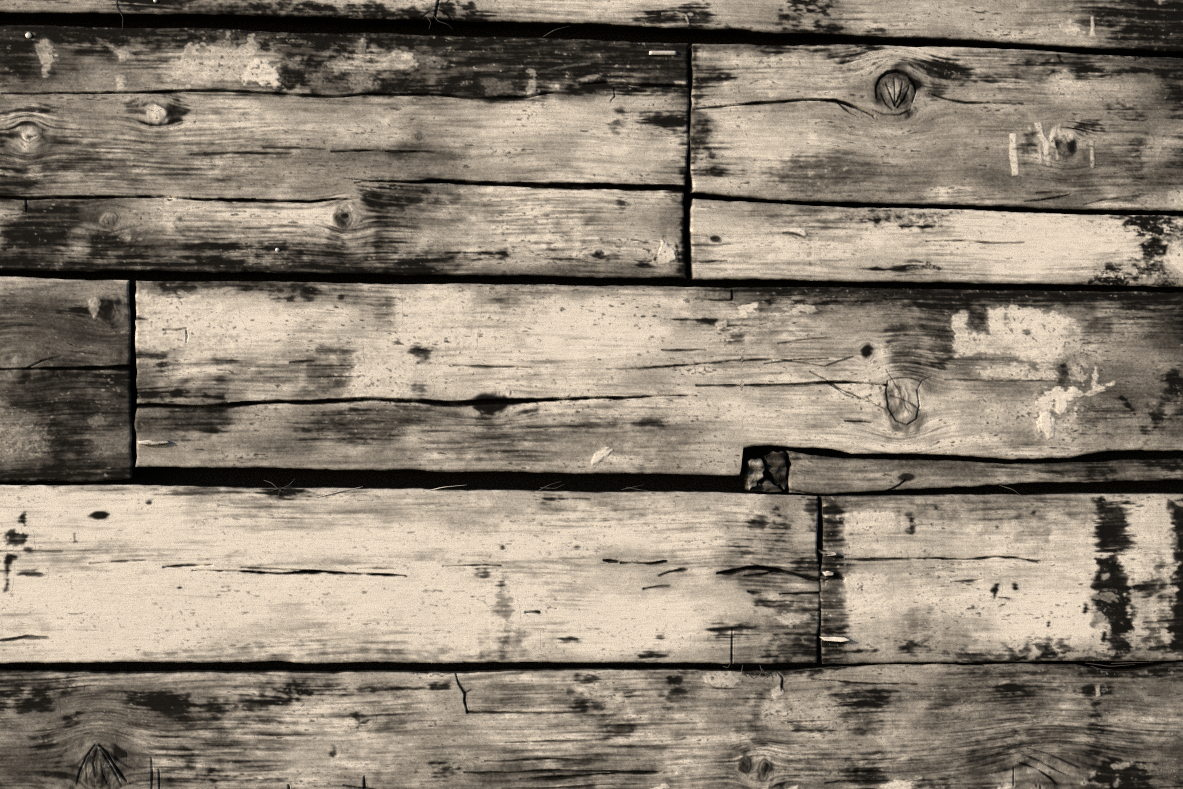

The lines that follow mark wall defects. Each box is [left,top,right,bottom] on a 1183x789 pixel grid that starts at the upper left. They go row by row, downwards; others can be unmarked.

crack [33,88,271,96]
crack [707,73,918,119]
damp [269,34,751,278]
crack [228,398,281,408]
damp [280,339,441,453]
damp [463,389,545,439]
peeling [946,302,1116,453]
damp [527,491,675,553]
damp [668,201,1183,789]
crack [33,549,408,577]
crack [602,558,820,596]
damp [117,676,425,789]